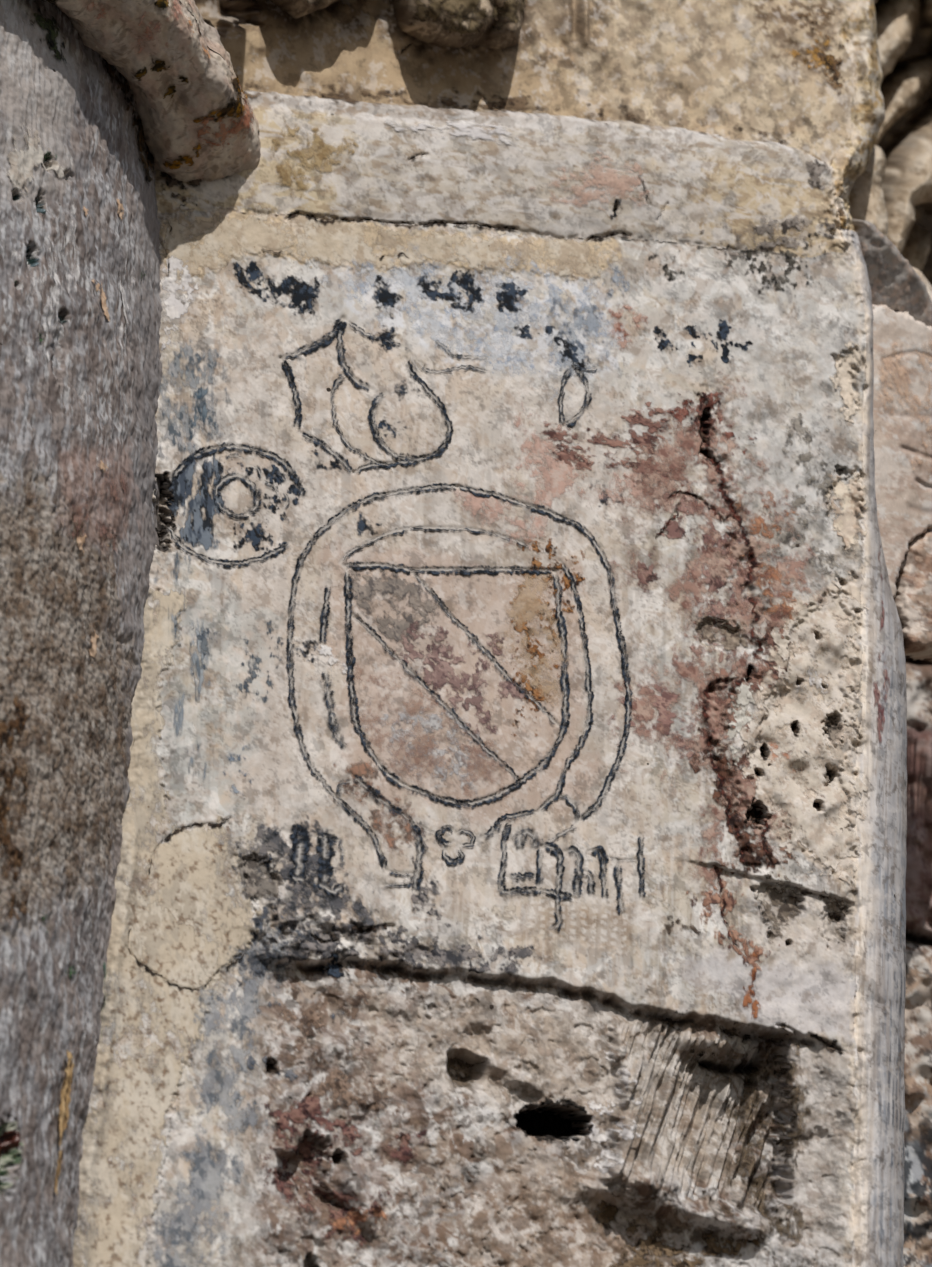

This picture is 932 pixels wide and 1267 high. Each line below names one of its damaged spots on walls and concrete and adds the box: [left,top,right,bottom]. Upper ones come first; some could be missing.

crack [287,211,516,260]
crack [588,232,629,240]
crack [656,396,773,946]
crack [148,818,230,874]
crack [128,929,245,991]
crack [780,1025,843,1054]